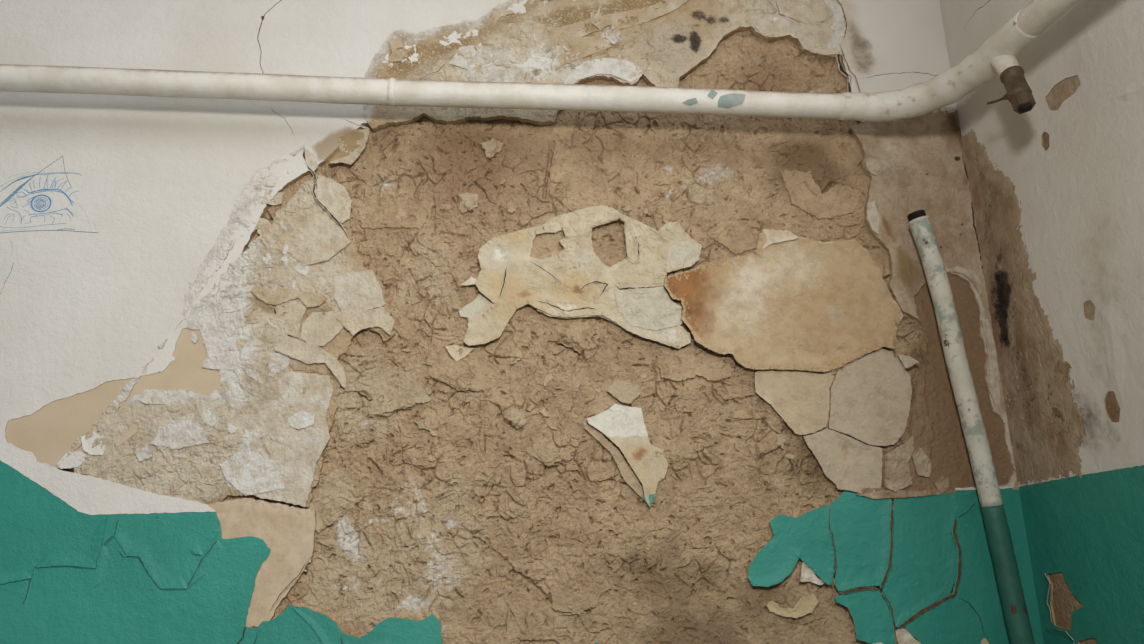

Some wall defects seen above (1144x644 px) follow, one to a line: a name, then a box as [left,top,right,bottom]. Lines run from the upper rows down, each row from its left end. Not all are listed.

crack [257,0,282,74]
flaking render [364,0,847,108]
peeling [1047,75,1081,111]
leakage [849,107,1091,499]
flaking render [0,105,960,644]
crack [235,627,258,644]
crack [830,502,985,635]
peeling [1039,572,1097,644]